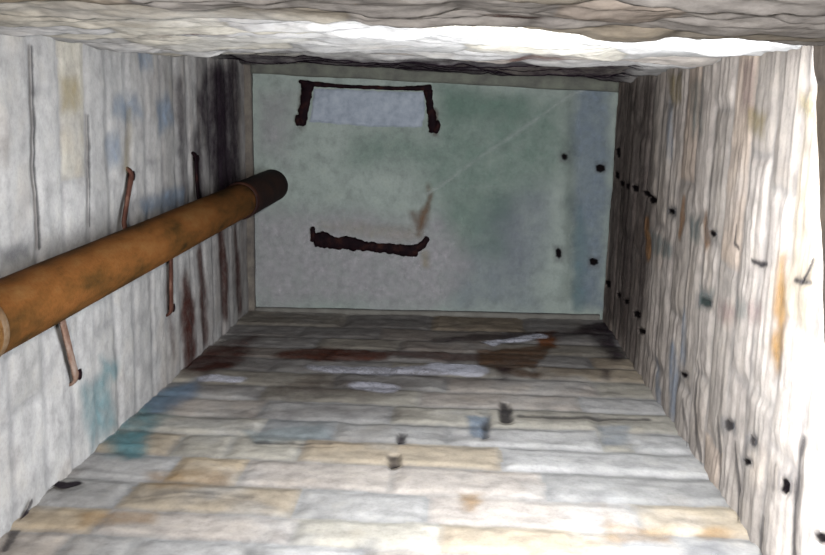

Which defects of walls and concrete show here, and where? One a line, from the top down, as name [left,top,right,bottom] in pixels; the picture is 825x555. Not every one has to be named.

water stain [195,54,629,198]
corrosion [279,349,387,361]
corrosion [478,332,555,377]